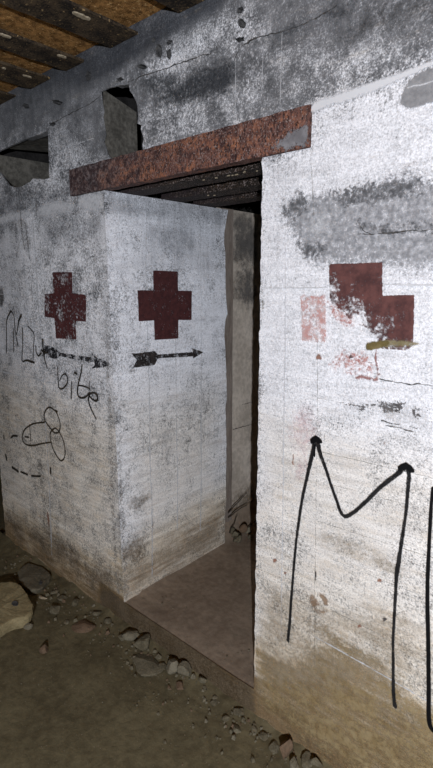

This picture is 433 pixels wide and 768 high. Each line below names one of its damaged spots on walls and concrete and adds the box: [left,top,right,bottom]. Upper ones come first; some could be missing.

crack [234,5,337,61]
crack [131,53,211,81]